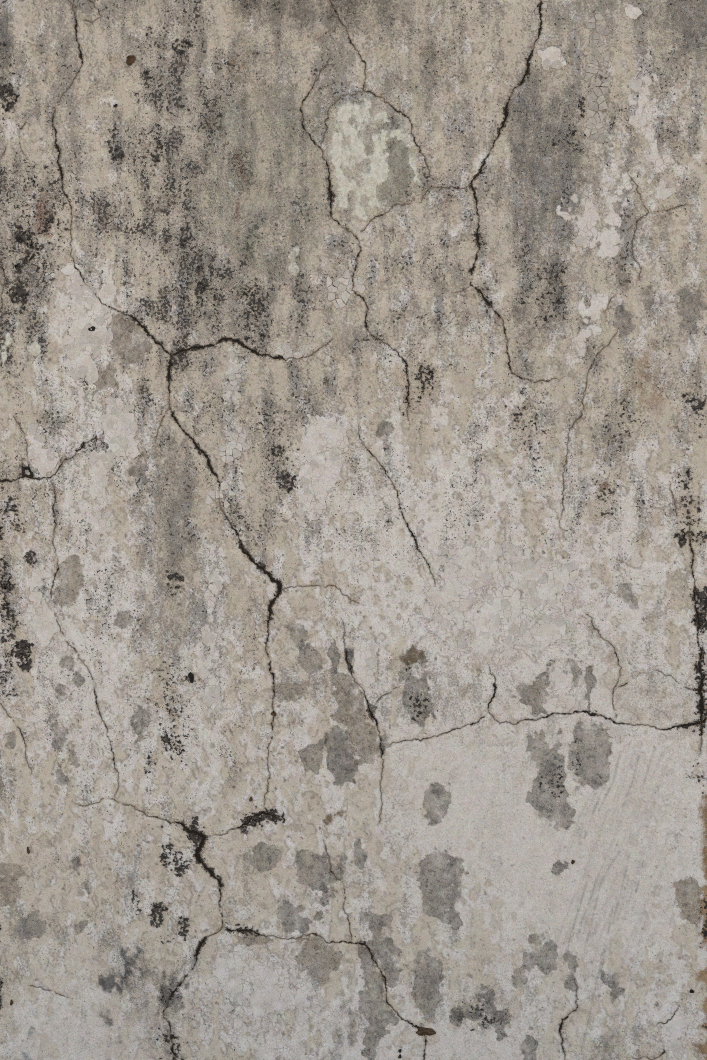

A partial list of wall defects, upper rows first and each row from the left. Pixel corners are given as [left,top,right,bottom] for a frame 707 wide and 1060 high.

leakage [6,162,72,315]
leakage [105,69,218,331]
crack [300,0,557,422]
peeling [537,46,566,71]
peeling [556,65,680,259]
peeling [625,4,643,19]
leakage [0,492,34,703]
peeling [61,263,152,551]
crack [0,0,435,1060]
crack [343,481,707,822]
leakage [673,468,707,553]
crack [558,981,578,1060]